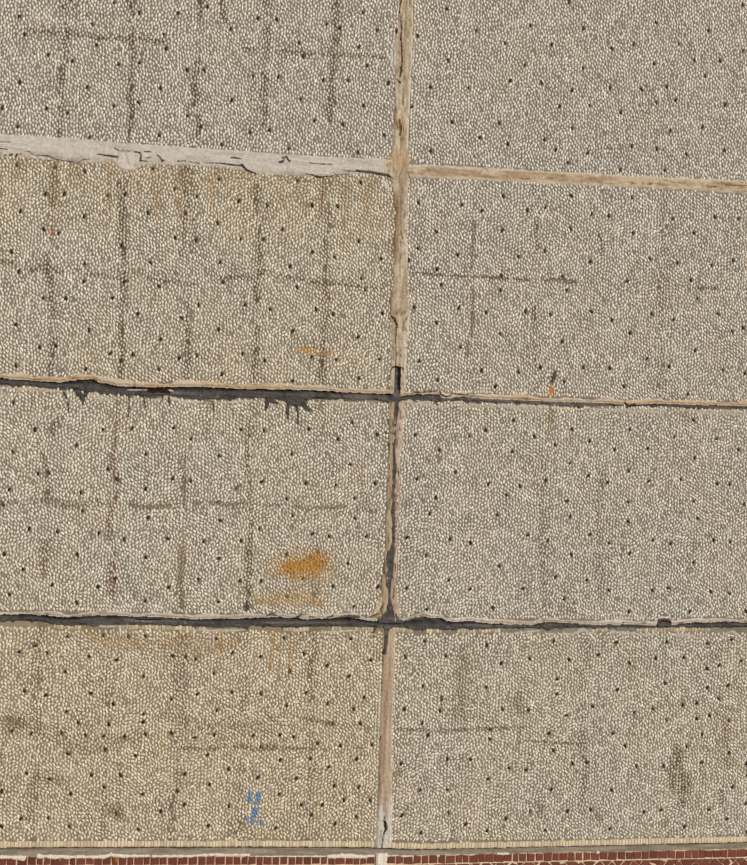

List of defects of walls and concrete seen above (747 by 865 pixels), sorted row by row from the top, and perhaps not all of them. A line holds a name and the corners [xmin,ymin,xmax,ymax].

crack [0,148,256,175]
crack [292,162,358,181]
rust [269,631,291,677]